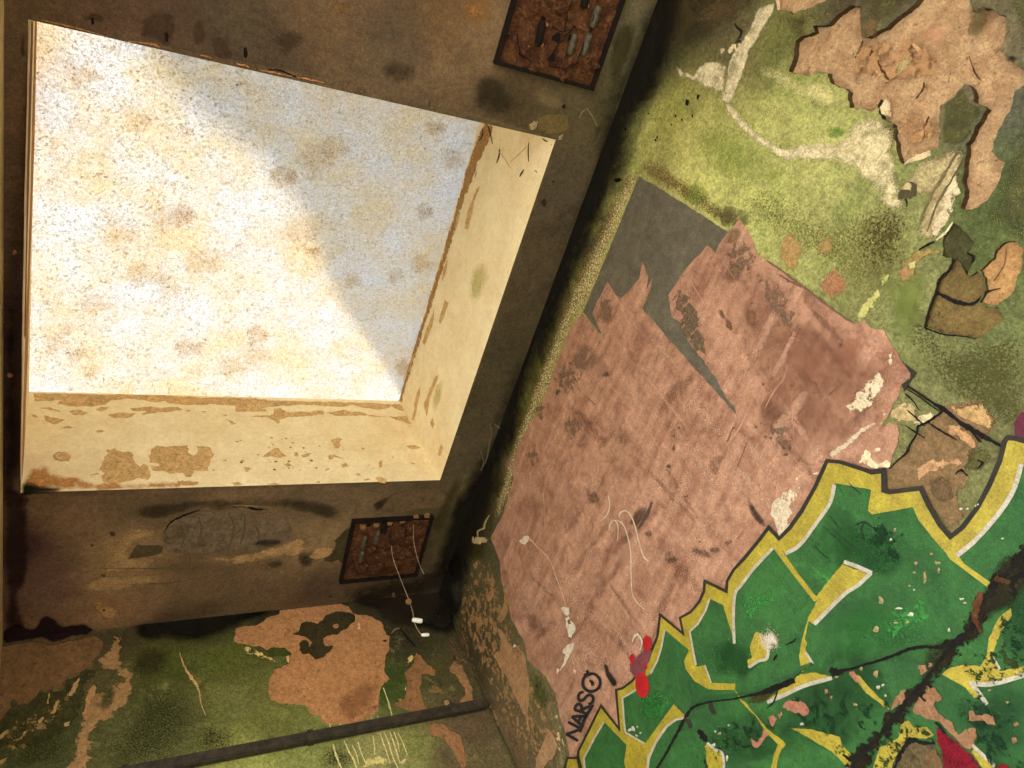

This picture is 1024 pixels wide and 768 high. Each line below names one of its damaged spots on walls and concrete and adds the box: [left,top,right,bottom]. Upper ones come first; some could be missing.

water stain [143,14,173,44]
spalling [776,0,826,14]
spalling [789,0,1024,210]
peeling [20,20,597,486]
water stain [436,0,1024,579]
spalling [899,222,1024,338]
spalling [770,352,996,536]
water stain [81,529,333,620]
peeling [0,635,133,768]
peeling [234,603,390,725]
crack [656,544,1024,768]